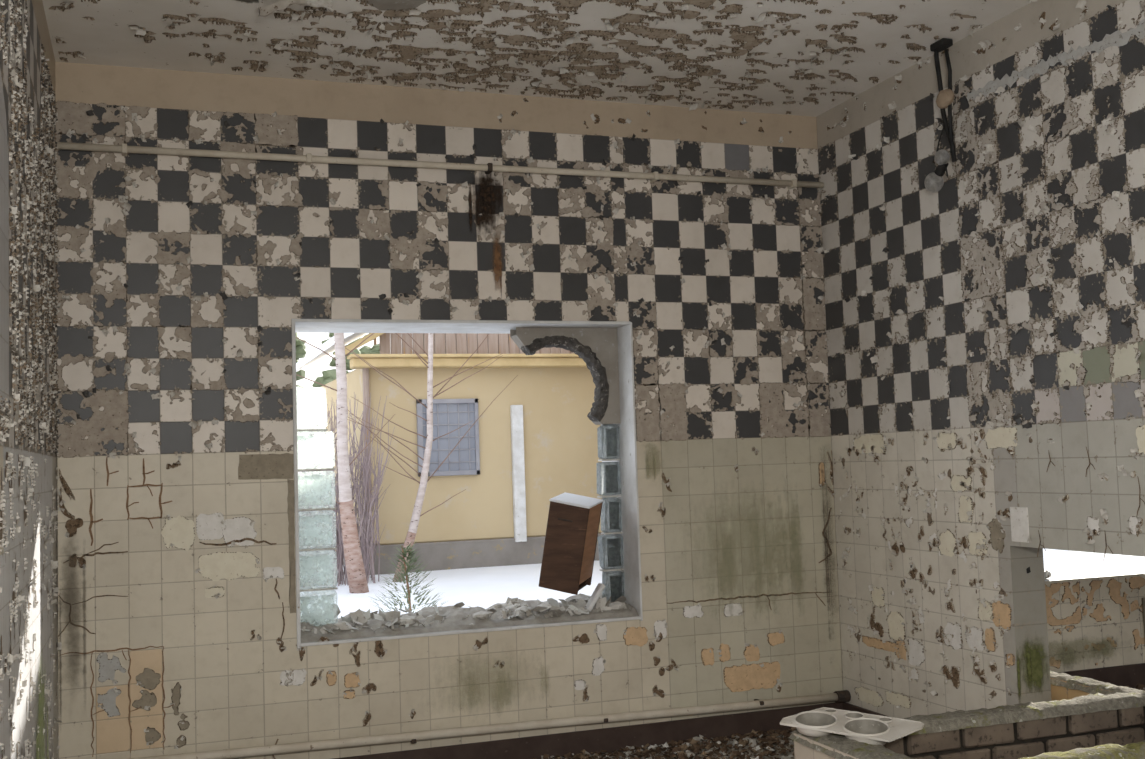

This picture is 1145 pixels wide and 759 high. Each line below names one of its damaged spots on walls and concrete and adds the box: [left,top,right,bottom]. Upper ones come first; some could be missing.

water stain [469,181,488,228]
peeling [0,0,344,759]
peeling [818,12,1145,709]
peeling [657,472,672,517]
peeling [682,603,704,618]
peeling [723,603,743,617]
peeling [374,640,387,659]
peeling [473,636,488,651]
peeling [572,624,607,644]
peeling [574,656,606,702]
peeling [623,619,679,698]
peeling [701,630,785,692]